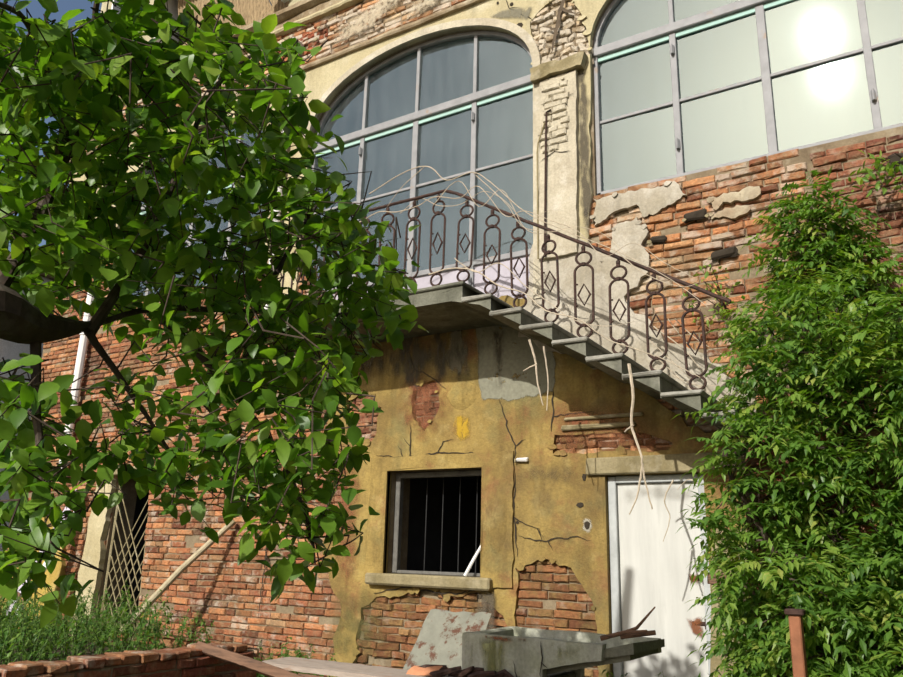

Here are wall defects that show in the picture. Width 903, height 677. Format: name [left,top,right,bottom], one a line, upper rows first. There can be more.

flaking render [517,0,594,65]
flaking render [537,77,570,154]
flaking render [682,186,761,223]
flaking render [590,181,687,302]
spalling [707,246,738,260]
flaking render [406,379,440,429]
crack [376,427,473,457]
crack [499,400,526,459]
flaking render [548,414,670,456]
crack [513,481,591,555]
flaking render [351,555,597,676]
flaking render [585,666,599,677]